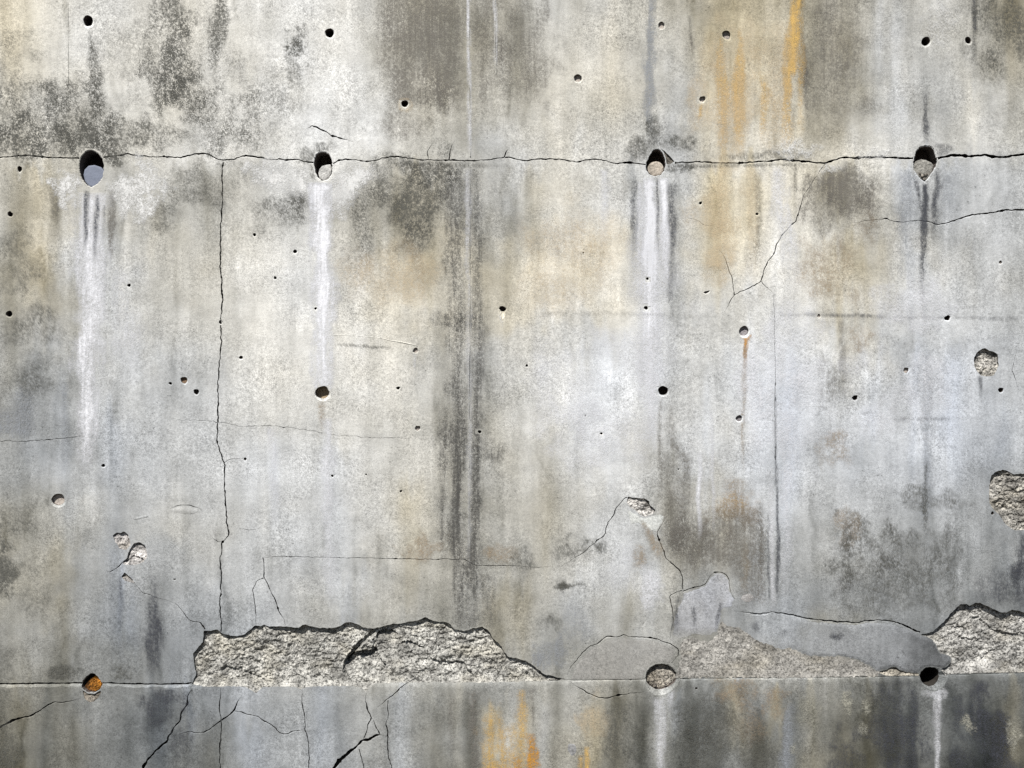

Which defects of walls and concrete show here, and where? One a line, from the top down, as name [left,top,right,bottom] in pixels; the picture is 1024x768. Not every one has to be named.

leakage [139,0,222,123]
rust [783,0,800,108]
leakage [0,41,217,456]
crack [0,125,646,632]
leakage [631,157,745,422]
crack [675,153,1024,476]
leakage [440,348,499,612]
spalling [989,470,1024,530]
crack [142,677,416,768]
rust [515,695,539,768]
spalling [192,573,1024,693]
crack [568,518,920,699]